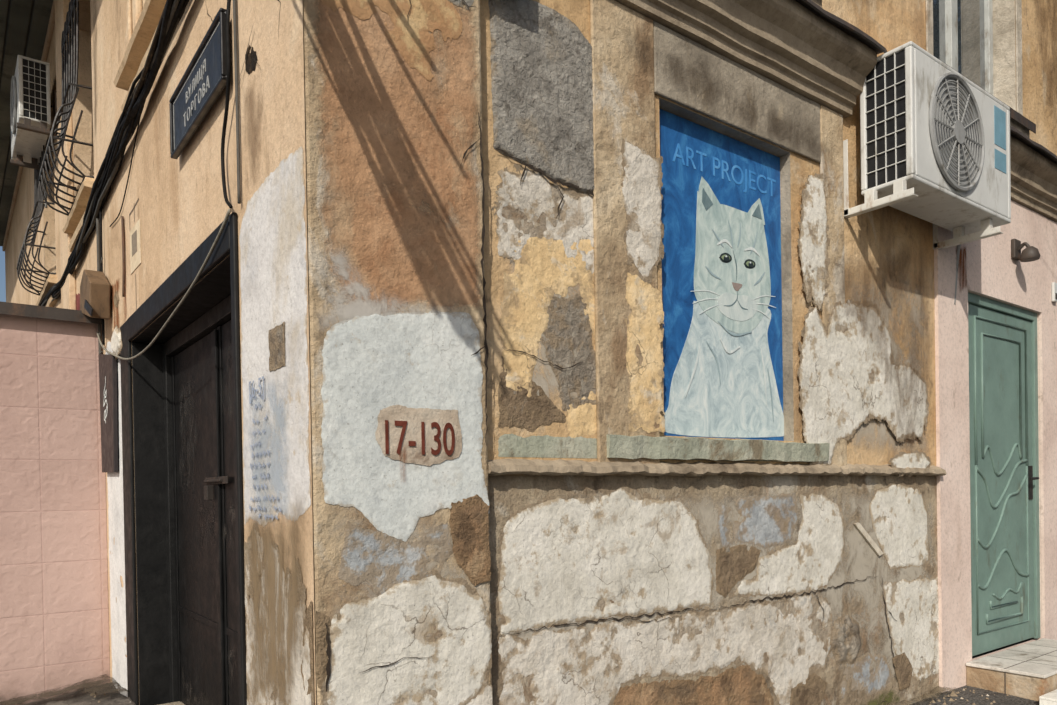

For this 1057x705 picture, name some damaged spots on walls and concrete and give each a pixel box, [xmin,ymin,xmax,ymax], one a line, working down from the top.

hole [245,45,258,74]
peeling [317,0,479,309]
peeling [268,322,285,371]
peeling [492,164,597,438]
peeling [797,173,931,477]
spalling [301,601,331,695]
peeling [505,610,663,641]
spalling [613,665,774,705]
spalling [683,500,774,613]
spalling [790,673,828,705]
peeling [800,497,930,691]